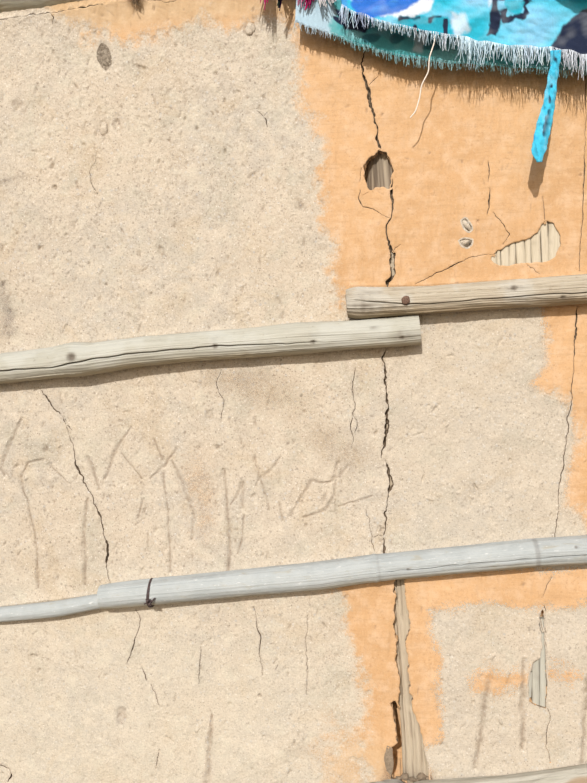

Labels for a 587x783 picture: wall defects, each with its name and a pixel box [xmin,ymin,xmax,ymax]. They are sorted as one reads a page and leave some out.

crack [360,47,382,150]
spalling [359,148,395,195]
crack [357,168,401,287]
peeling [458,217,474,249]
spalling [489,219,563,268]
crack [40,389,111,583]
crack [365,347,395,553]
peeling [383,306,587,552]
crack [553,307,579,537]
peeling [478,564,587,579]
peeling [425,598,587,780]
crack [0,764,13,782]